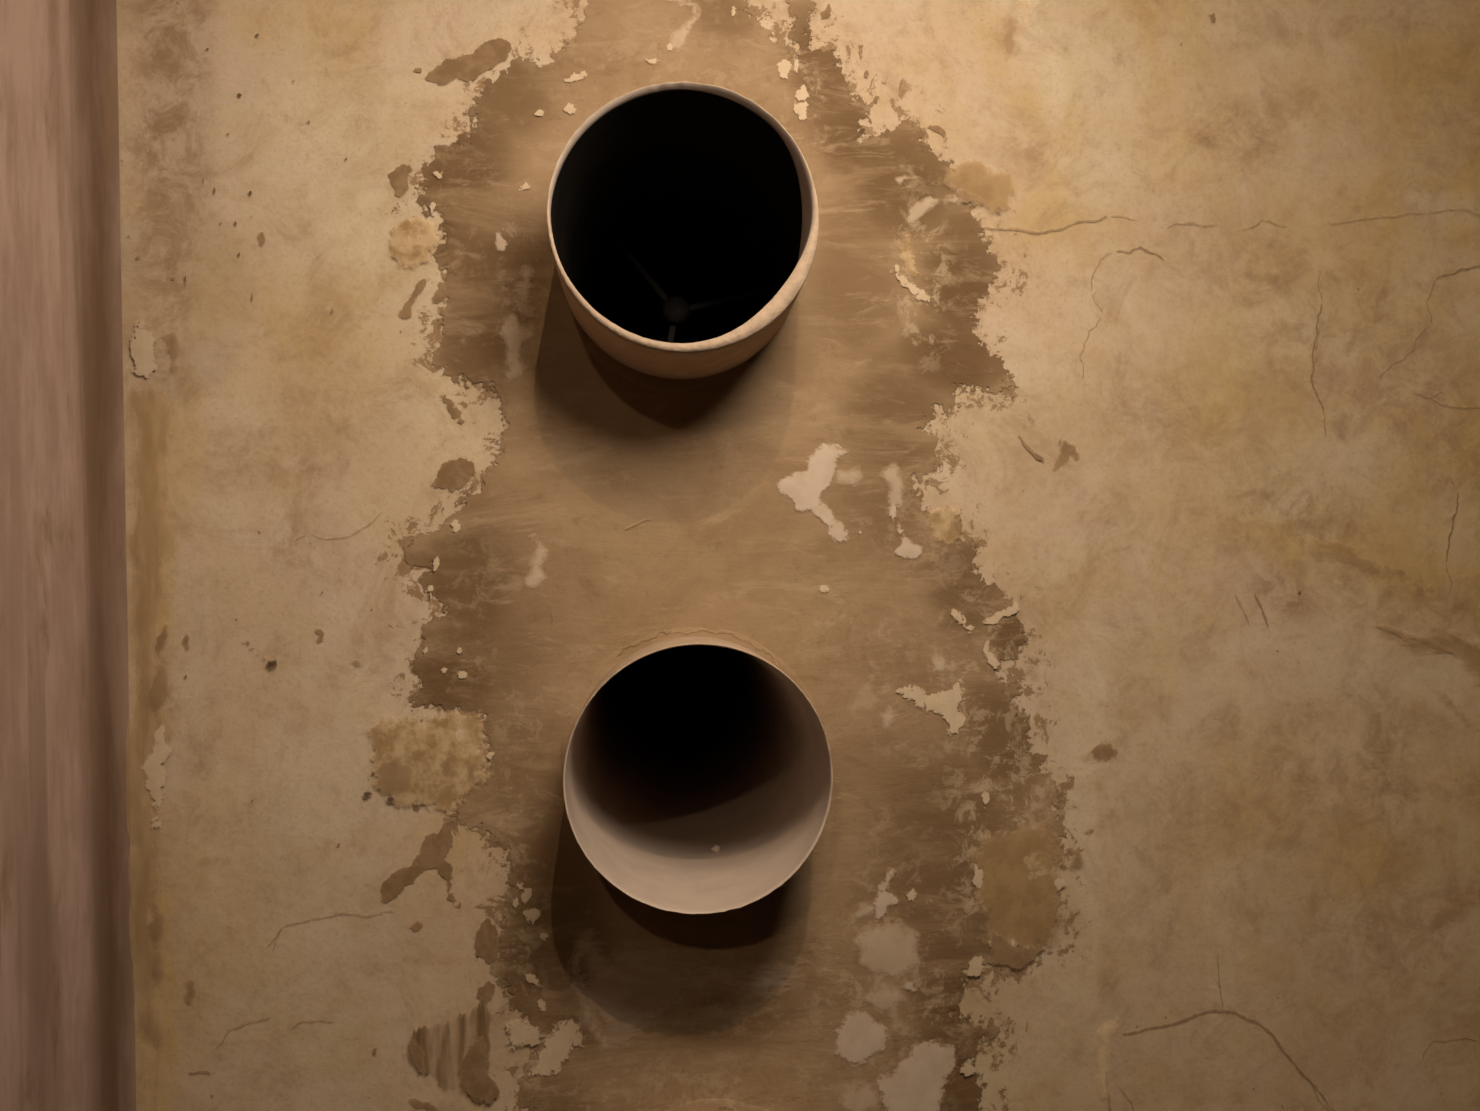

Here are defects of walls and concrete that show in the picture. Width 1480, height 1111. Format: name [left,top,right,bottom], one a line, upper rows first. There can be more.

crack [983,215,1283,374]
crack [1311,279,1326,435]
crack [1446,479,1459,590]
spalling [363,711,490,813]
crack [1106,963,1335,1111]